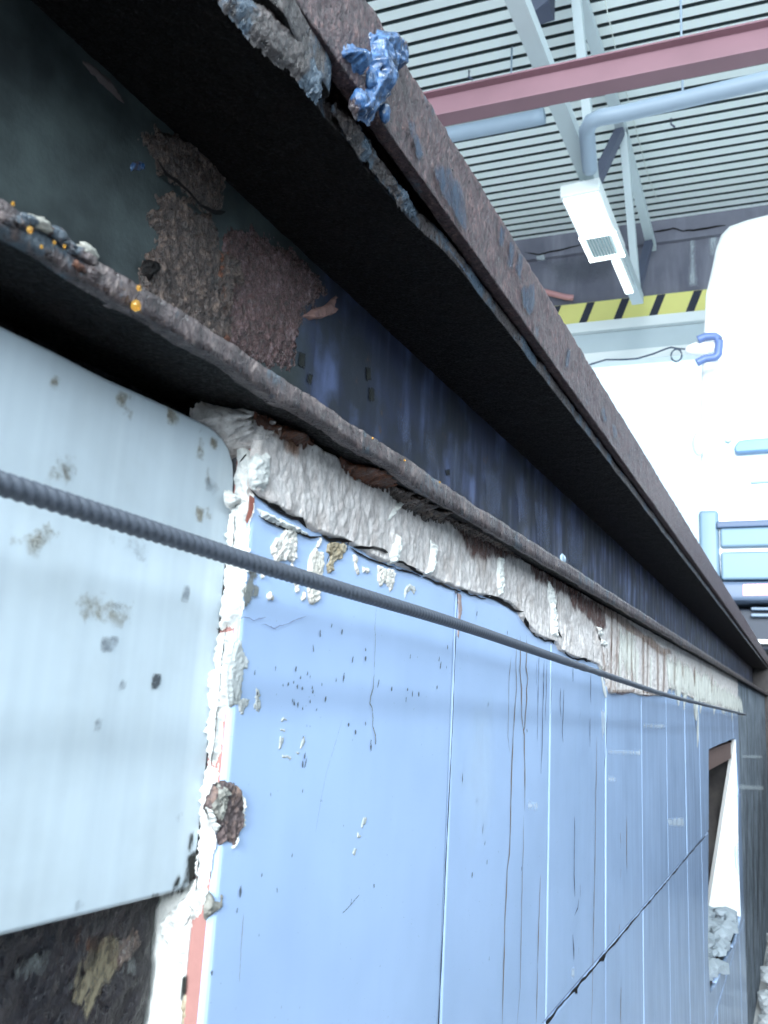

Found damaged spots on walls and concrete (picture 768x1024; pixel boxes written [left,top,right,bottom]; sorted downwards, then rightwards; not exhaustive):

corrosion [137,124,328,372]
peeling [227,639,262,714]
peeling [294,584,321,605]
peeling [270,529,416,597]
corrosion [528,563,675,696]
damp [507,649,564,870]